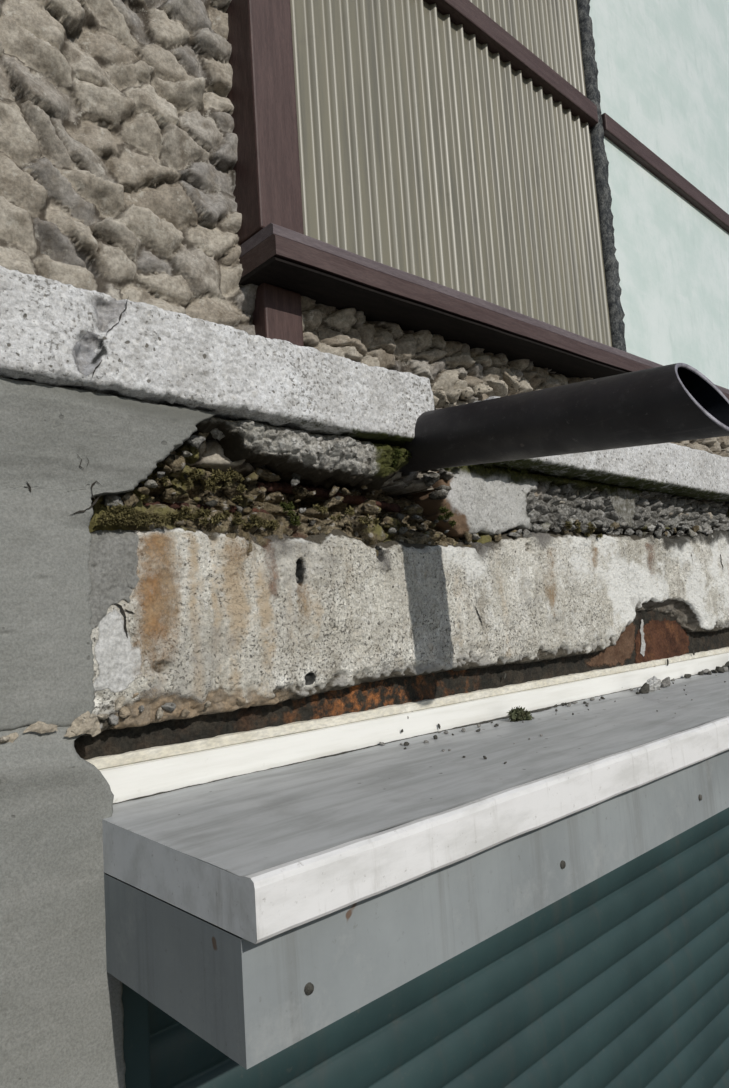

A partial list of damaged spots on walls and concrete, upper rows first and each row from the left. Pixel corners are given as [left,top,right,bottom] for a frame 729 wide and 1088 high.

spalling [88,417,729,628]
corrosion [138,533,179,643]
spalling [587,600,699,667]